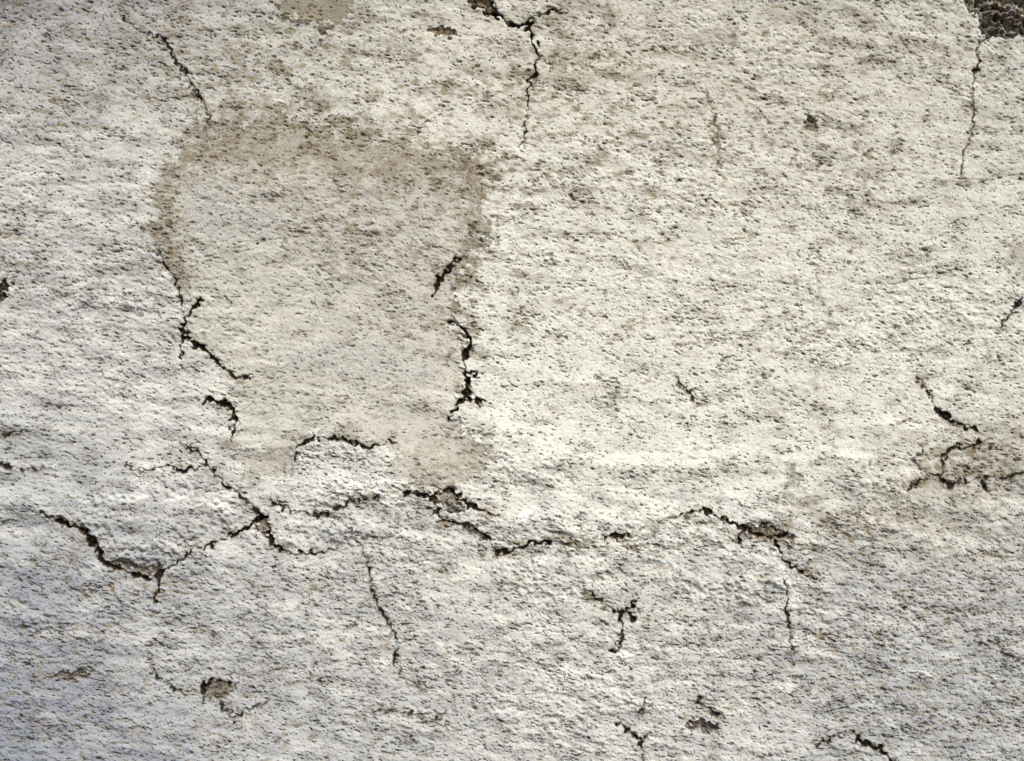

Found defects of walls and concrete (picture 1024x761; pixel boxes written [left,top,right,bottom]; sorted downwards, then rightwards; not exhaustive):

crack [119,10,211,125]
crack [491,8,561,147]
flaking render [963,0,1024,43]
crack [431,257,463,297]
crack [157,250,251,441]
crack [447,320,486,421]
crack [294,435,394,460]
crack [907,377,1024,491]
crack [1,442,552,731]
crack [592,592,637,653]
crack [674,507,810,650]
crack [816,730,892,761]